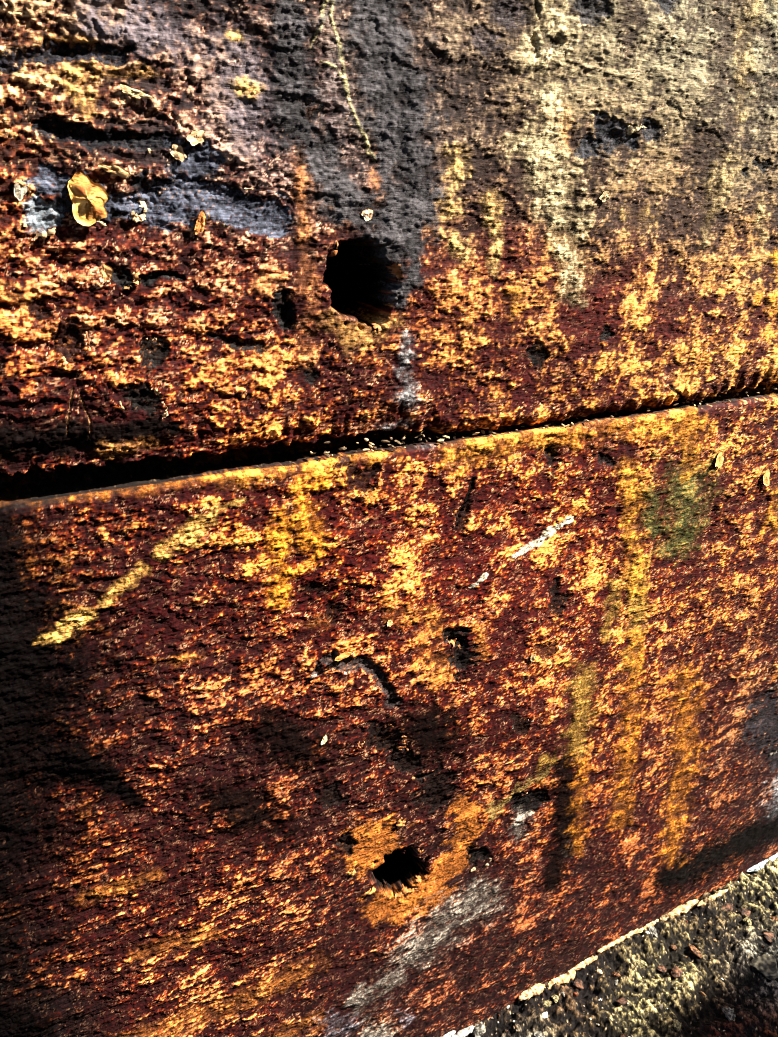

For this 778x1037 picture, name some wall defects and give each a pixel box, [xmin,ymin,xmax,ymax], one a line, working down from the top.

rust [255,268,289,292]
rust [437,425,595,476]
rust [608,407,713,480]
rust [140,451,399,607]
rust [619,459,648,598]
spalling [315,780,350,809]
spalling [310,650,404,709]
spalling [325,721,492,927]
spalling [509,788,550,815]
rust [607,630,651,827]
rust [656,665,708,866]
spalling [738,664,778,779]